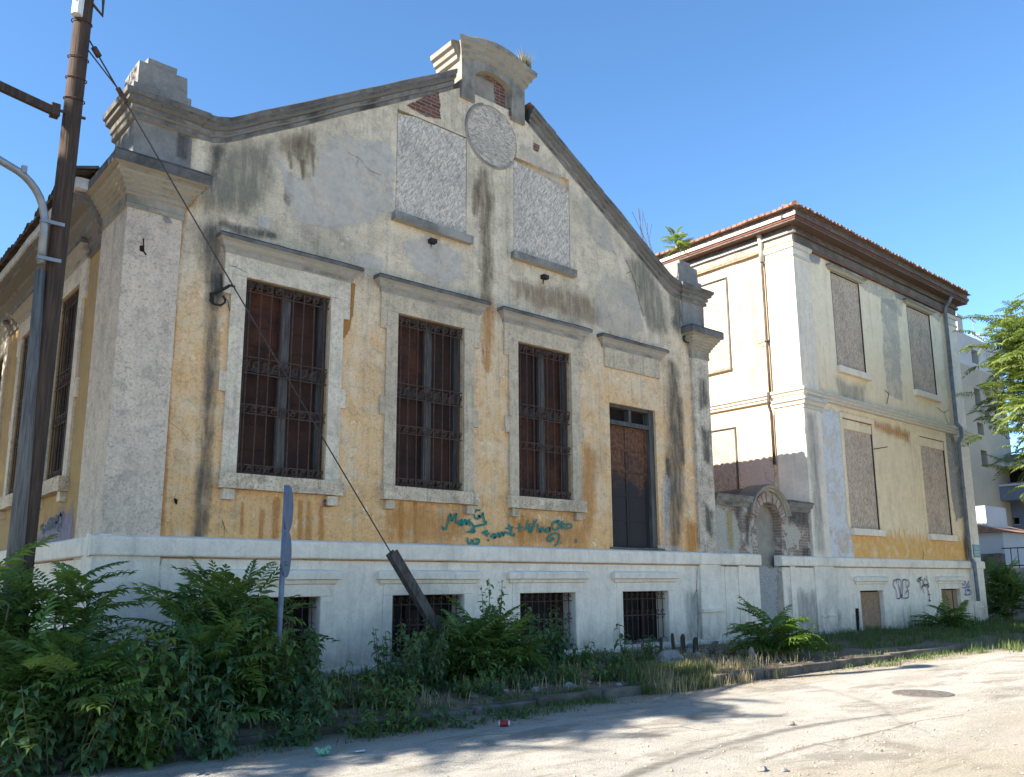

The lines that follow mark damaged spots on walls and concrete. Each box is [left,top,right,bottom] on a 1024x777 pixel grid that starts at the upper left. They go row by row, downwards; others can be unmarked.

spalling [407,91,441,119]
leakage [284,135,314,179]
leakage [474,172,491,302]
leakage [203,222,275,309]
leakage [195,323,216,537]
leakage [665,364,684,551]
rust [259,498,280,539]
rust [299,501,324,541]
peeling [715,505,742,553]